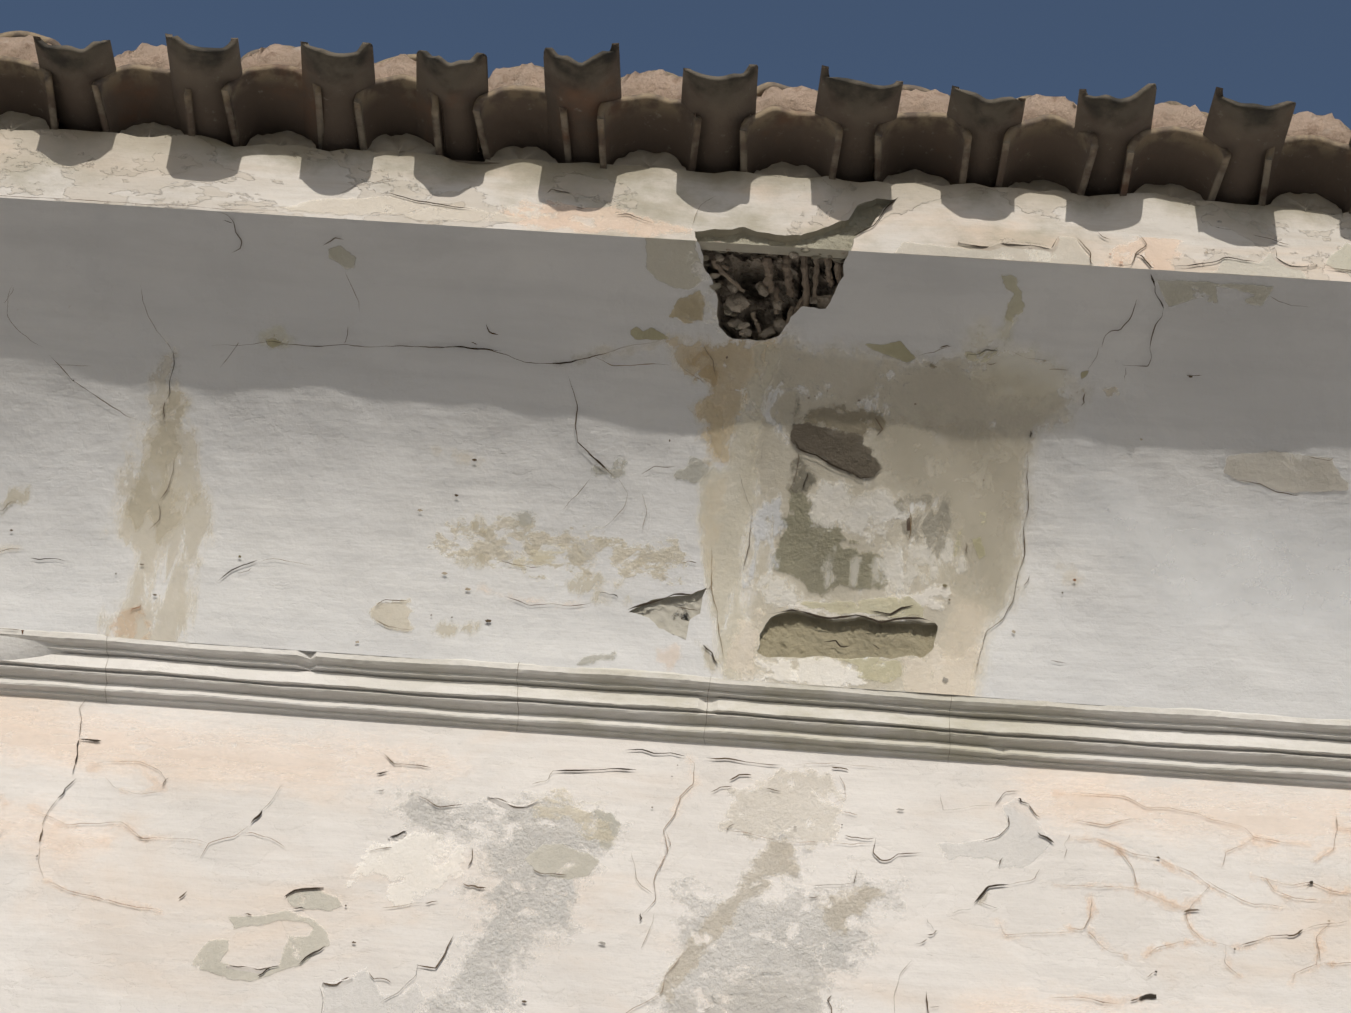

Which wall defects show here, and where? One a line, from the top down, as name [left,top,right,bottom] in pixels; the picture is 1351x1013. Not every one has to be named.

spalling [509,189,897,341]
damp [106,353,210,642]
crack [222,330,665,528]
peeling [428,516,713,639]
spalling [704,390,986,696]
peeling [1224,451,1349,496]
crack [36,634,283,910]
crack [371,829,407,851]
peeling [194,788,613,1013]
crack [377,684,874,948]
peeling [626,769,921,1013]
crack [894,791,1351,1013]